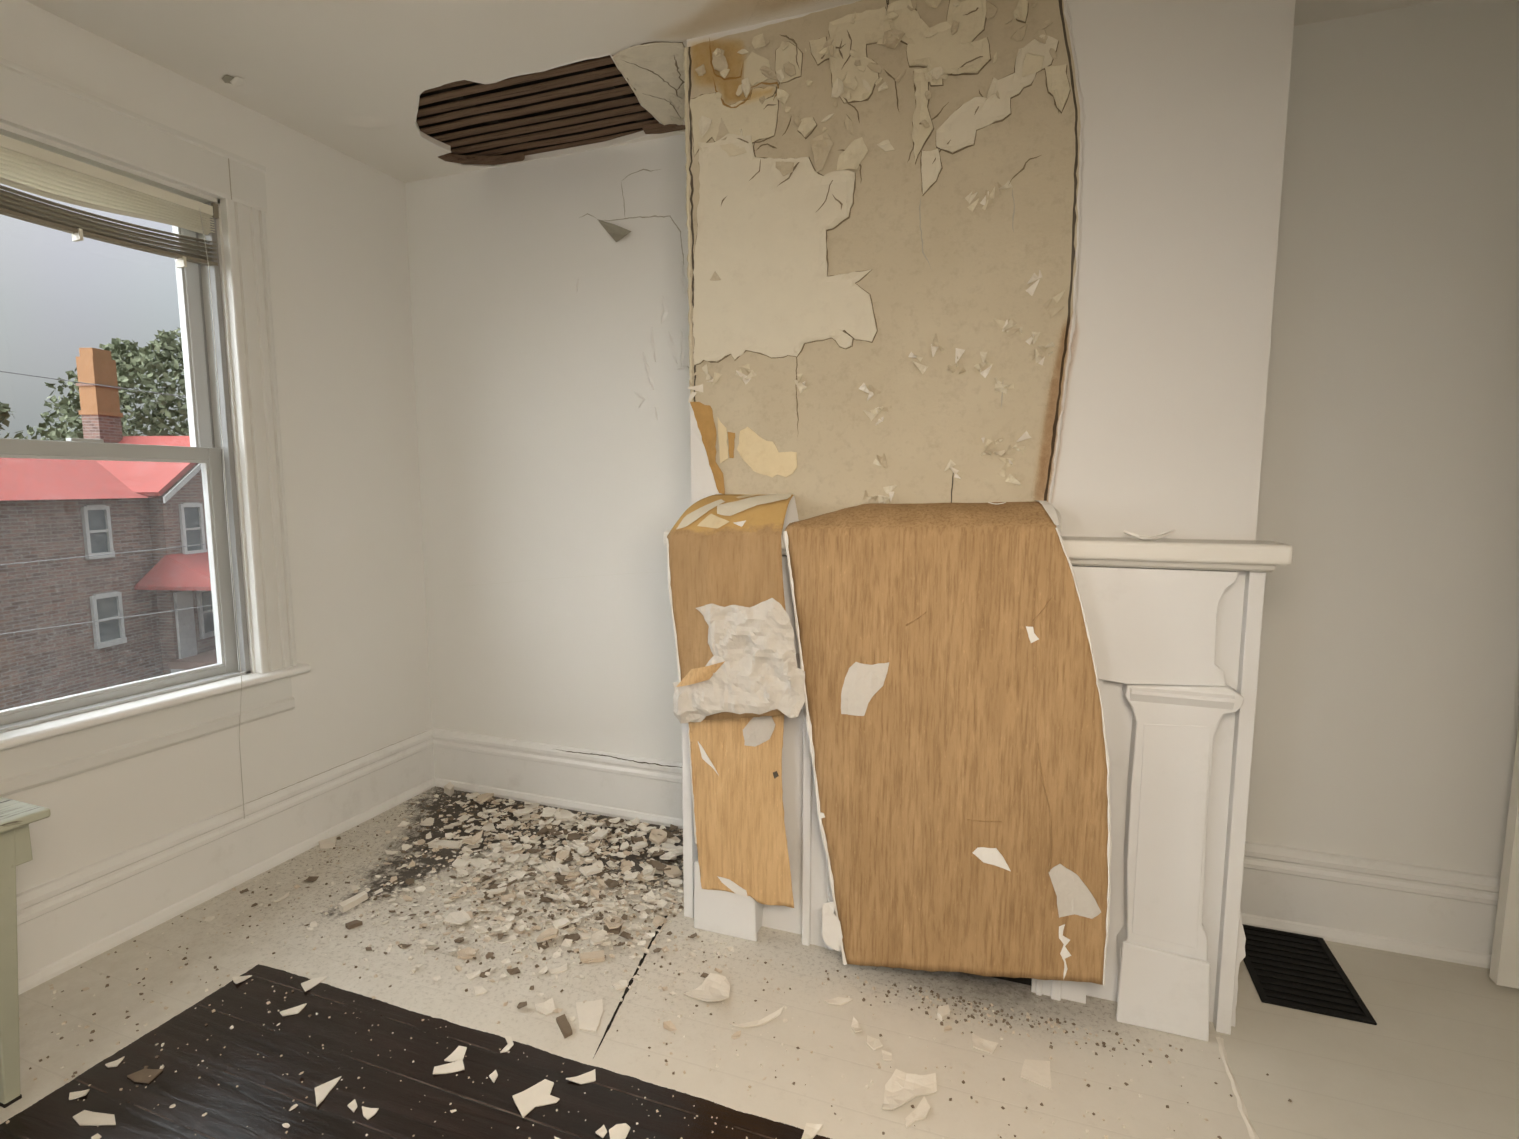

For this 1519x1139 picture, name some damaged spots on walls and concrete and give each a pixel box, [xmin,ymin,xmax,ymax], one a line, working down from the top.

flaking render [414,0,1081,521]